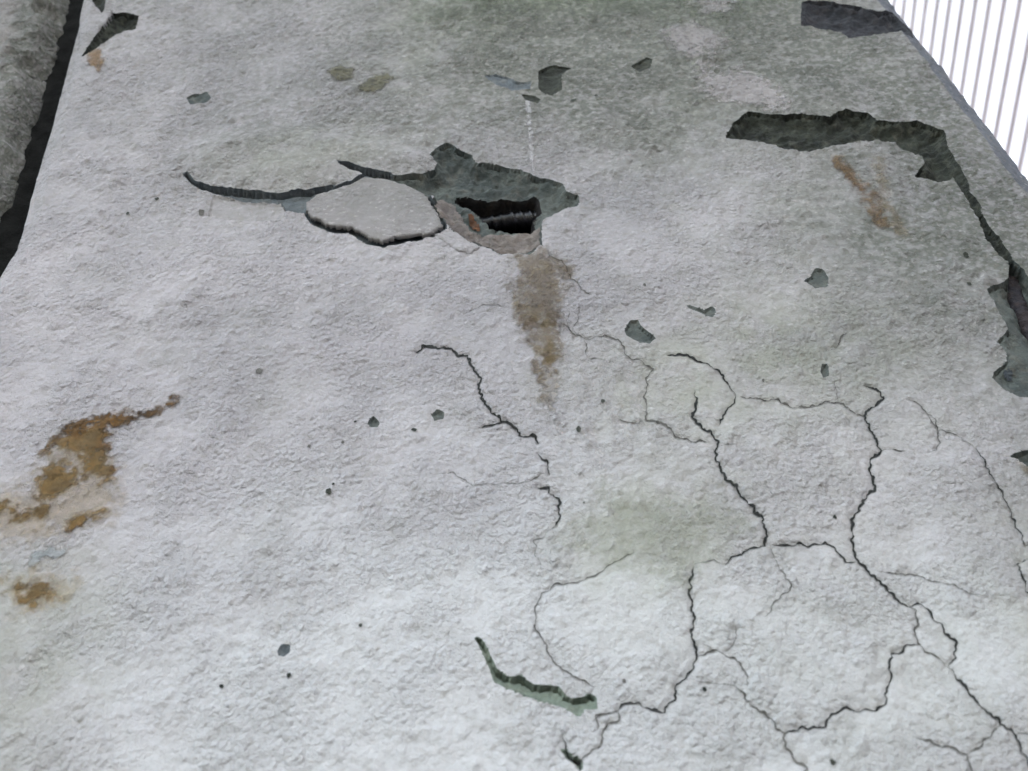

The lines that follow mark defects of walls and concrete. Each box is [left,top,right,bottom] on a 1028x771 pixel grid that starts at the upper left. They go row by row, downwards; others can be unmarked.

peeling [78,0,139,56]
spalling [485,65,571,103]
spalling [801,0,913,38]
spalling [182,143,580,255]
spalling [725,108,1028,397]
rust [65,508,107,532]
rust [0,394,180,523]
crack [416,344,562,560]
crack [549,255,1028,771]
rust [14,582,56,608]
crack [534,553,633,687]
peeling [475,637,598,716]